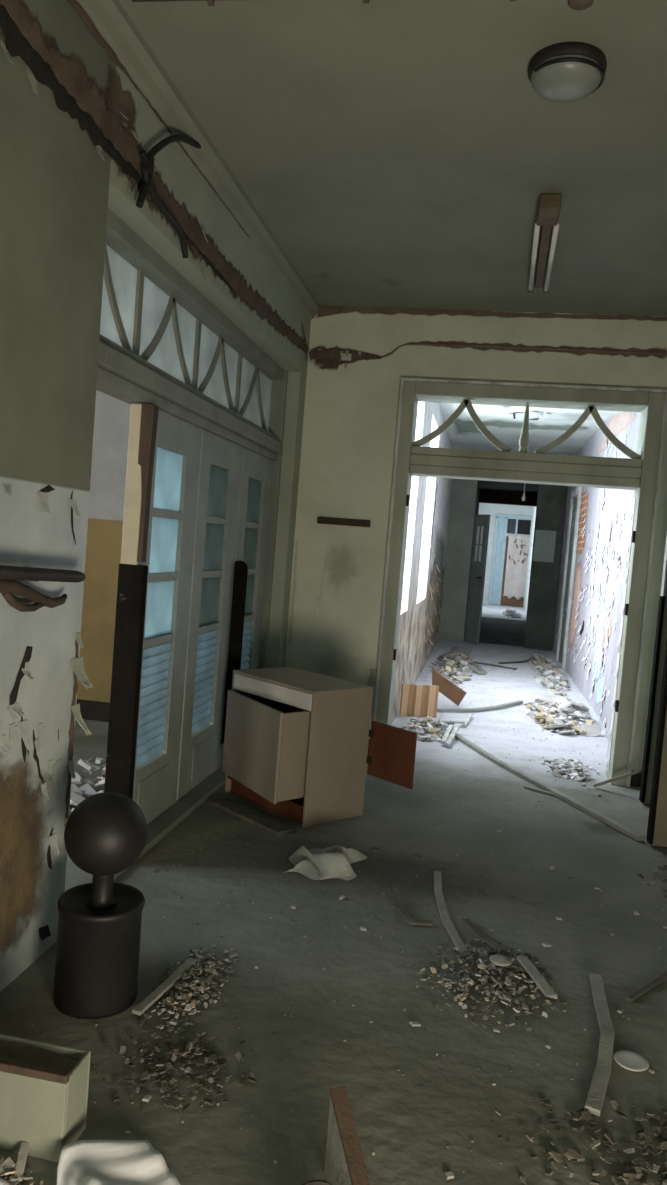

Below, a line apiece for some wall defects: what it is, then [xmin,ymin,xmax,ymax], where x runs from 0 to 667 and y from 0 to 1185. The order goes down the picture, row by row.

spalling [0,0,667,369]
peeling [0,633,94,952]
peeling [555,493,636,773]